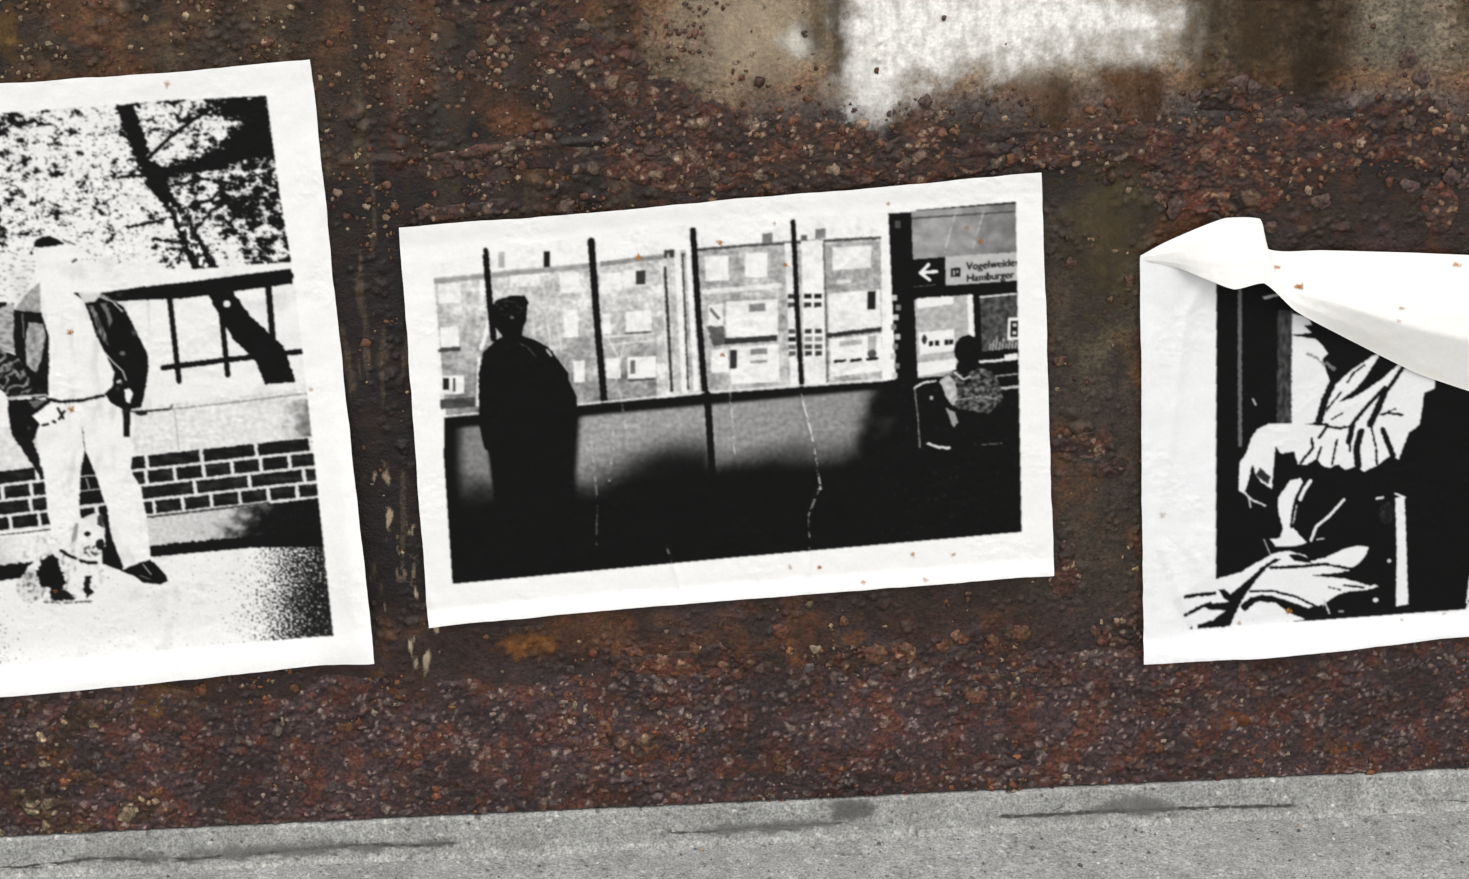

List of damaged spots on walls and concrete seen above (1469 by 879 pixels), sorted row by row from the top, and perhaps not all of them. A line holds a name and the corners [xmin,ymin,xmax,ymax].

damp [840,0,1184,112]
rust [1050,427,1142,491]
rust [0,539,1469,836]